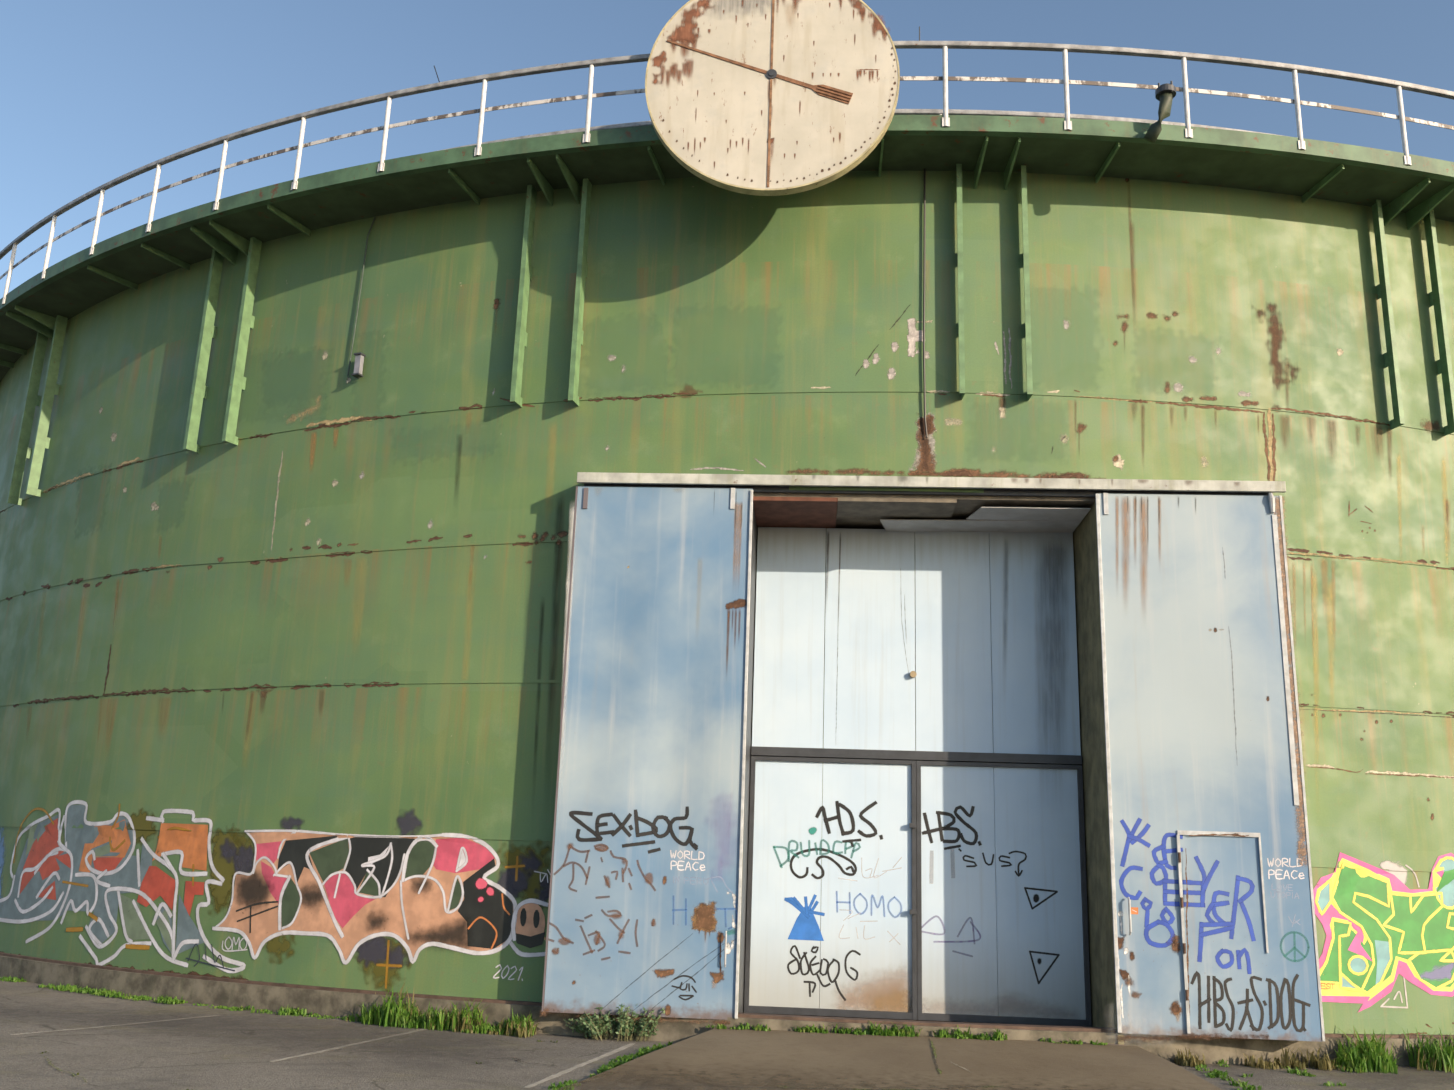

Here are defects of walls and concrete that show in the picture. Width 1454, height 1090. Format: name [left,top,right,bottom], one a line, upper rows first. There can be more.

corrosion [653,0,896,183]
peeling [863,318,932,379]
corrosion [1113,311,1178,345]
corrosion [1257,304,1298,387]
corrosion [304,411,423,462]
corrosion [788,414,1101,479]
corrosion [5,564,181,601]
corrosion [250,543,373,565]
corrosion [1074,382,1454,866]
corrosion [13,646,399,708]
corrosion [691,902,724,983]
corrosion [1170,833,1249,1015]